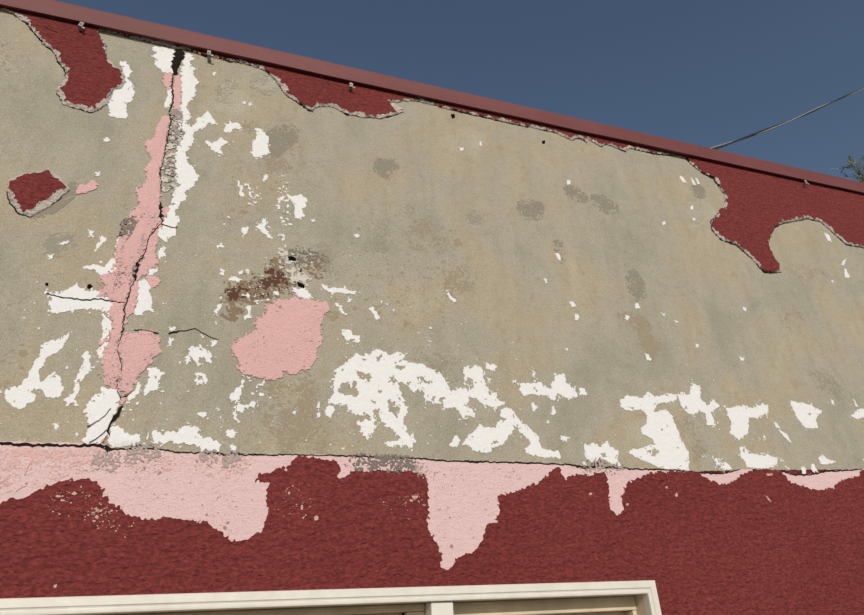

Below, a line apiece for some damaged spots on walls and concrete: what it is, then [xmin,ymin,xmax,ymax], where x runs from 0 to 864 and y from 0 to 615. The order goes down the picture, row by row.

spalling [159,121,186,223]
corrosion [220,256,297,322]
spalling [285,267,312,287]
corrosion [304,255,330,279]
crack [0,32,740,492]
spalling [338,370,372,397]
spalling [384,399,400,418]
peeling [0,443,101,504]
peeling [373,458,424,473]
peeling [568,465,669,515]
crack [777,468,862,476]
peeling [782,464,861,490]